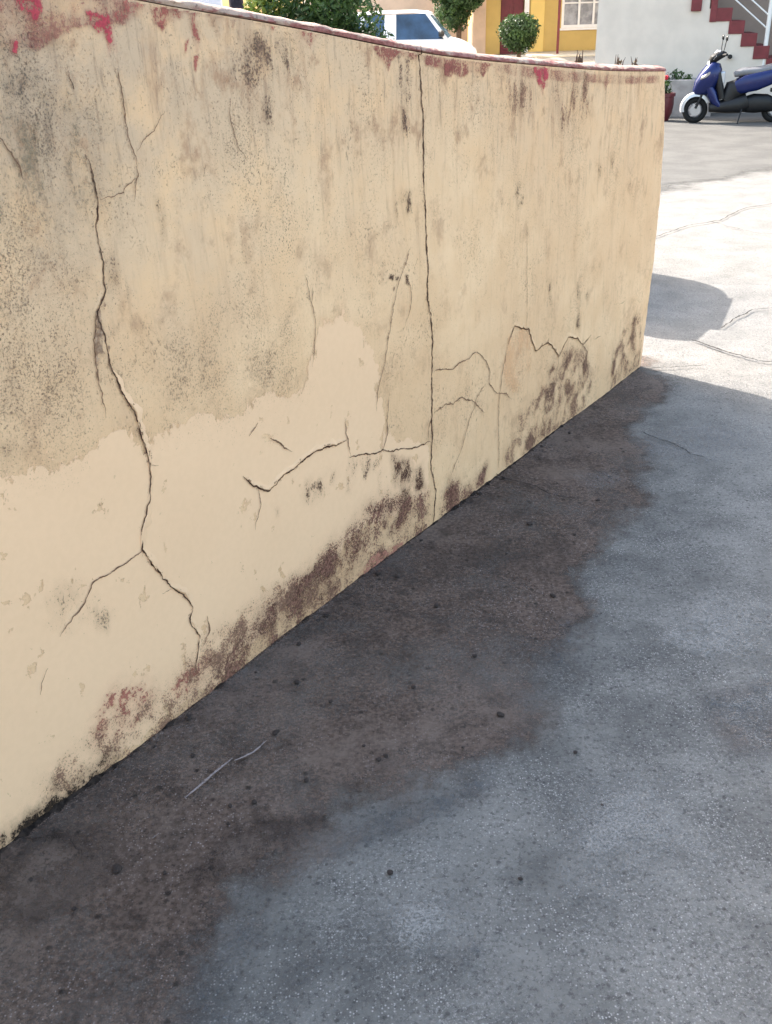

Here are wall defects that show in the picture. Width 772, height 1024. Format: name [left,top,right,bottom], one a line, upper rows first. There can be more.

crack [60,56,75,89]
crack [61,71,210,674]
peeling [0,303,430,848]
damp [42,456,488,803]
crack [243,45,600,529]
damp [505,347,592,465]
damp [610,317,642,387]